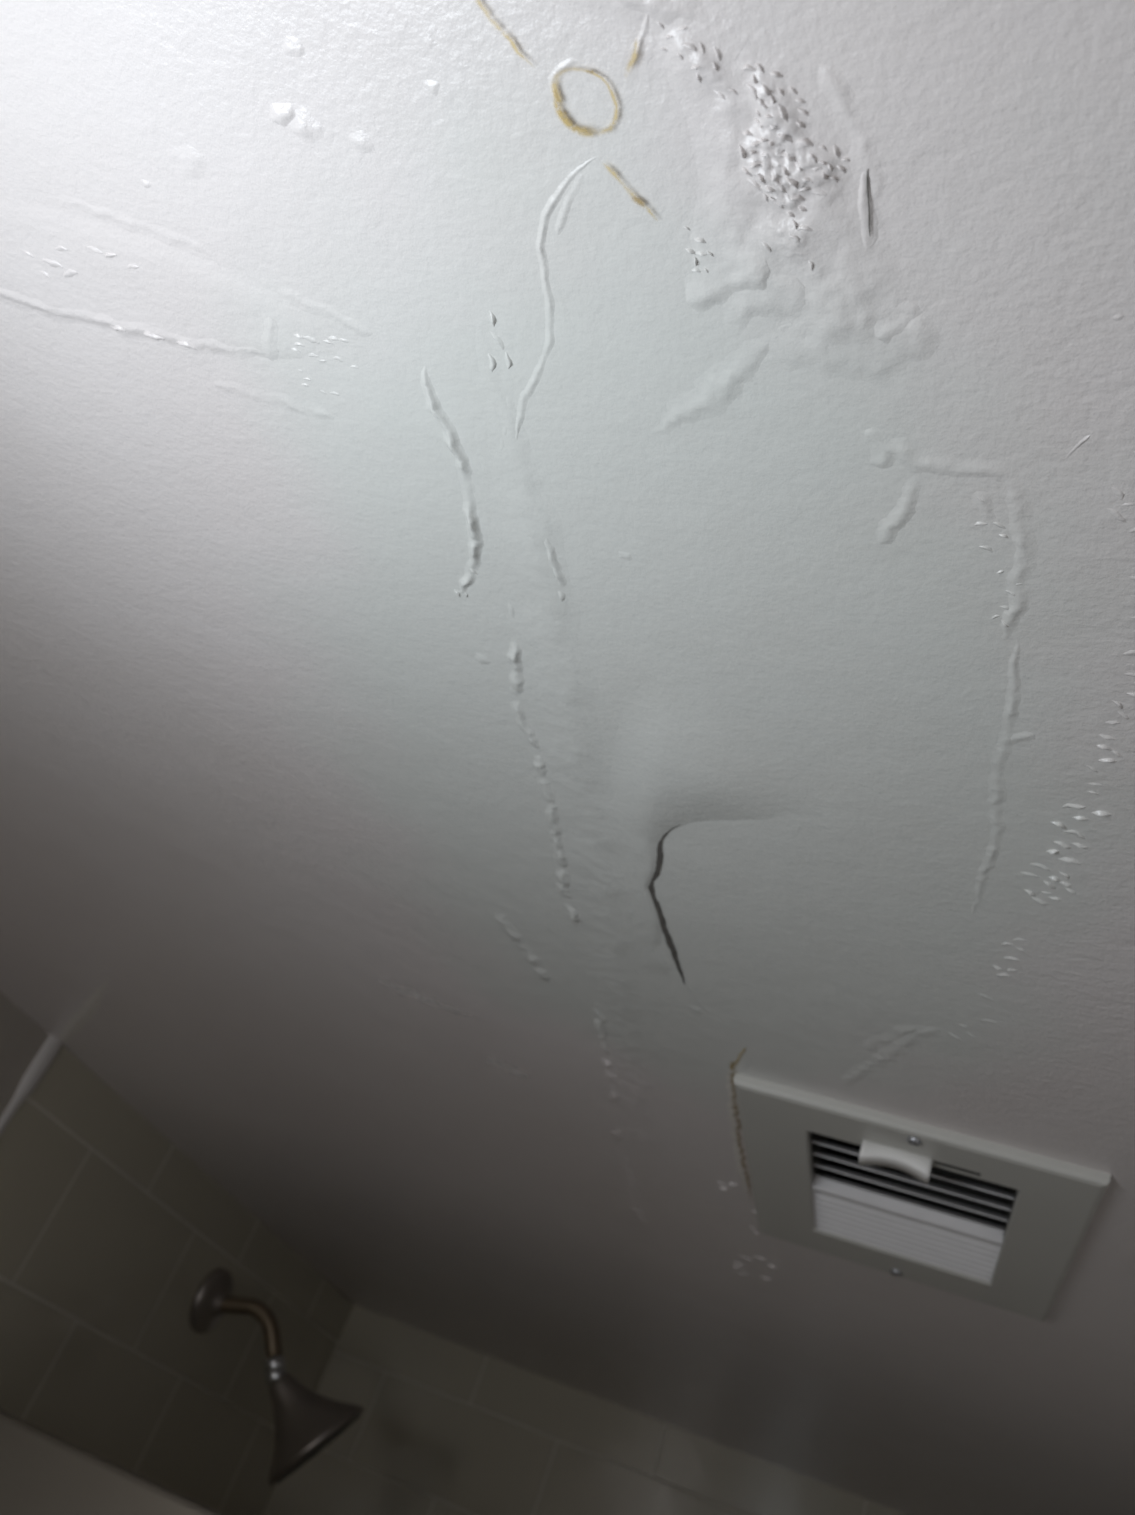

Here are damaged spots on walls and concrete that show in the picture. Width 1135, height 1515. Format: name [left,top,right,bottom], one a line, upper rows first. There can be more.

crack [648,824,713,1013]